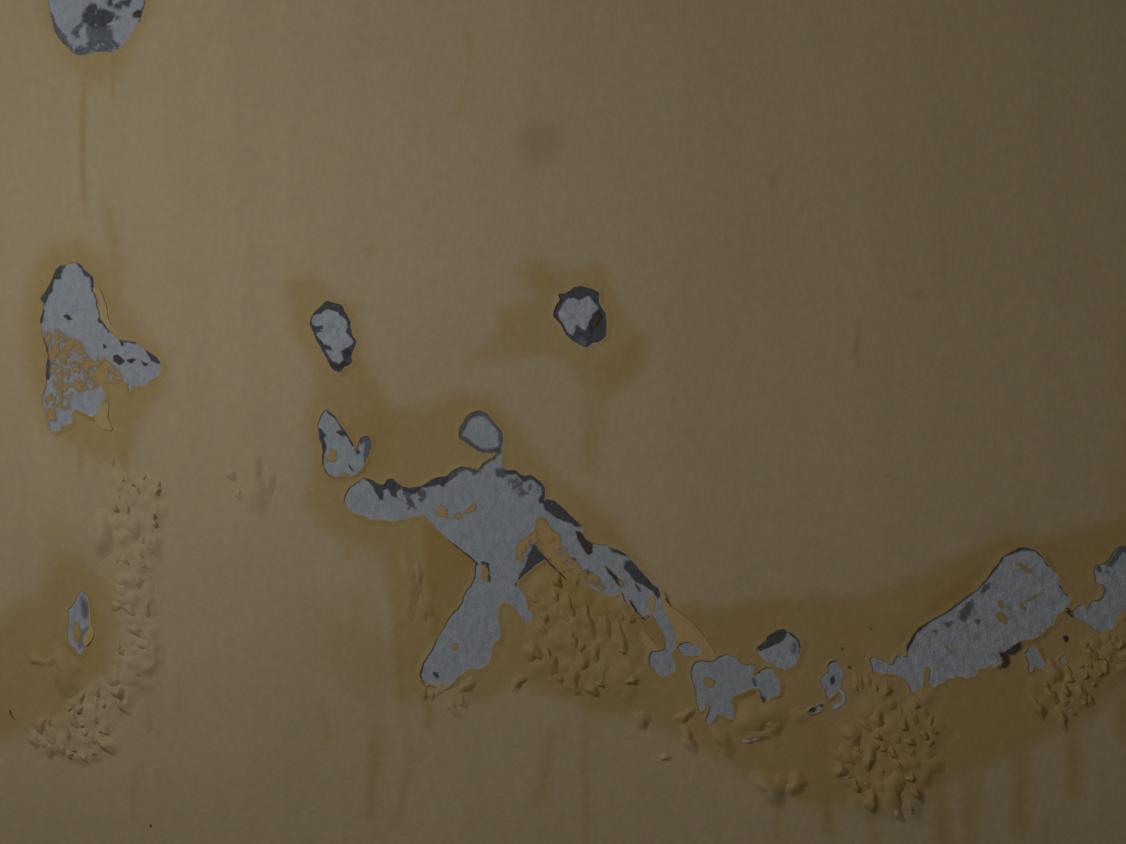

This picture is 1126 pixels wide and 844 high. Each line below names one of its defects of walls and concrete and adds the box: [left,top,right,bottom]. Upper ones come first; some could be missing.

peeling [313,405,806,728]